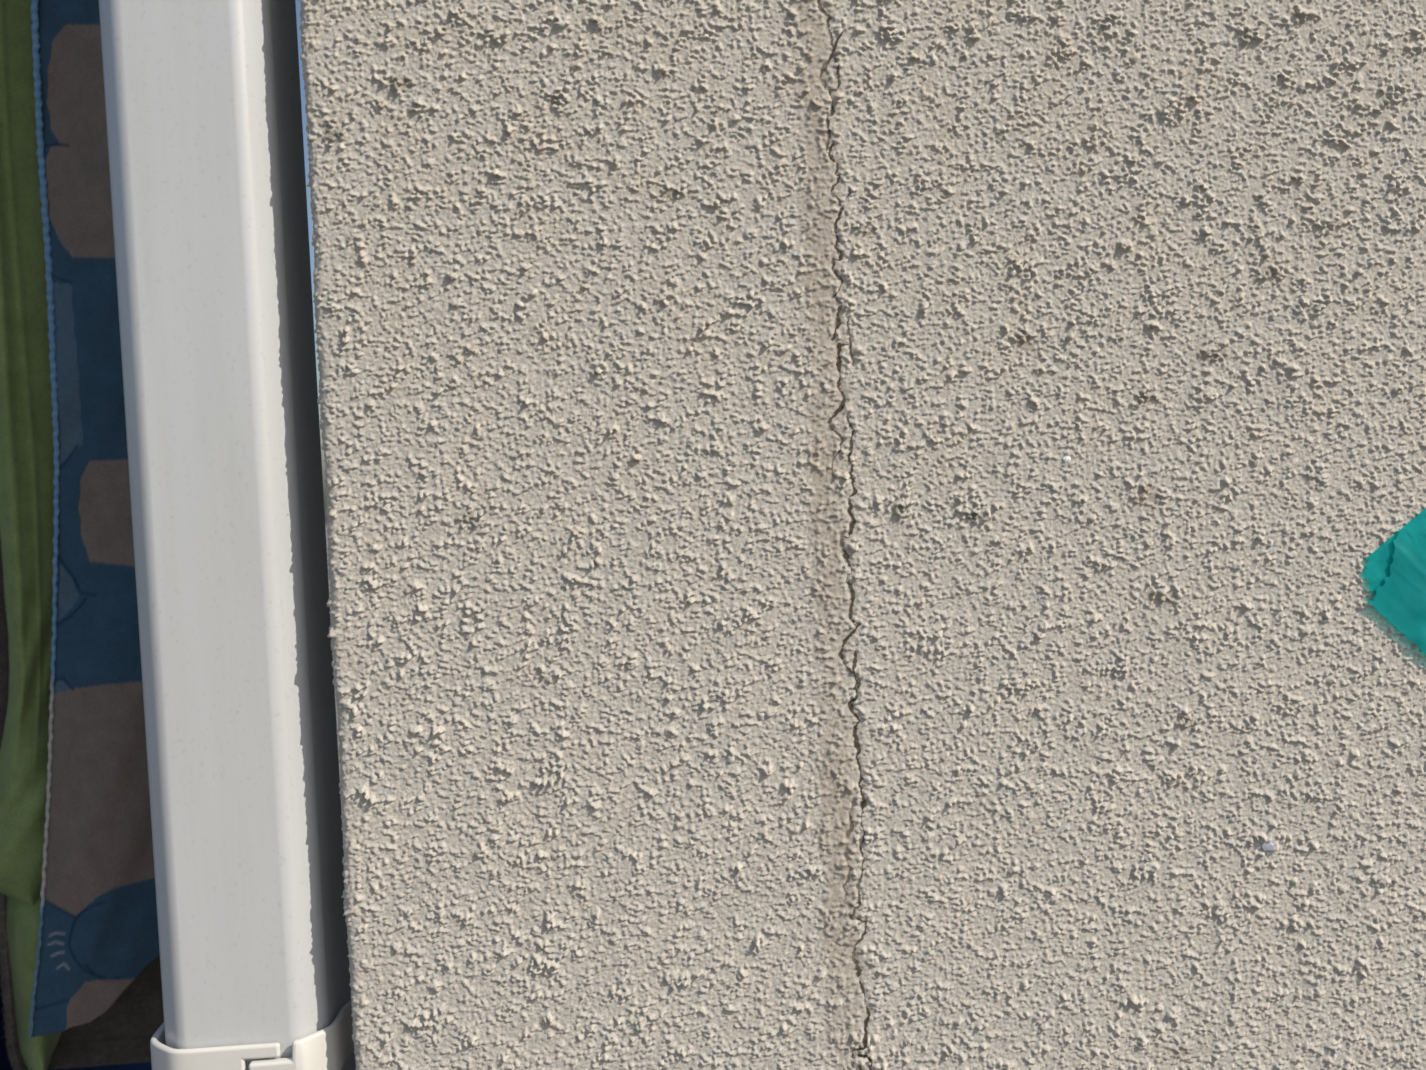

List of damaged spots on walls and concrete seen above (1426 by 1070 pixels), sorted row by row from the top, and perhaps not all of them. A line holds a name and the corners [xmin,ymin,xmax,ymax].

crack [818,0,873,1070]